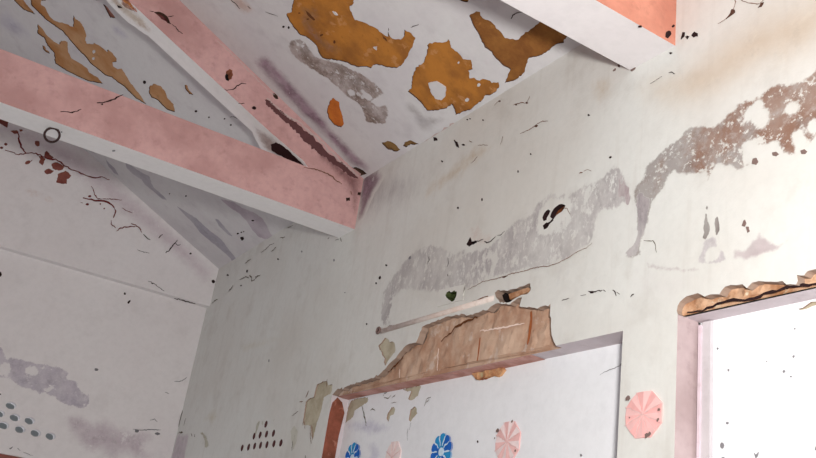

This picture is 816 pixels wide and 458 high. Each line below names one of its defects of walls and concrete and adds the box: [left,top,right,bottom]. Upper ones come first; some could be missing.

peeling [15,0,175,111]
peeling [282,0,415,127]
peeling [409,11,567,120]
crack [718,0,764,24]
crack [5,132,192,254]
leakage [248,50,499,236]
leakage [380,0,816,328]
leakage [0,347,161,458]
leakage [171,431,209,458]
peeling [304,381,332,437]